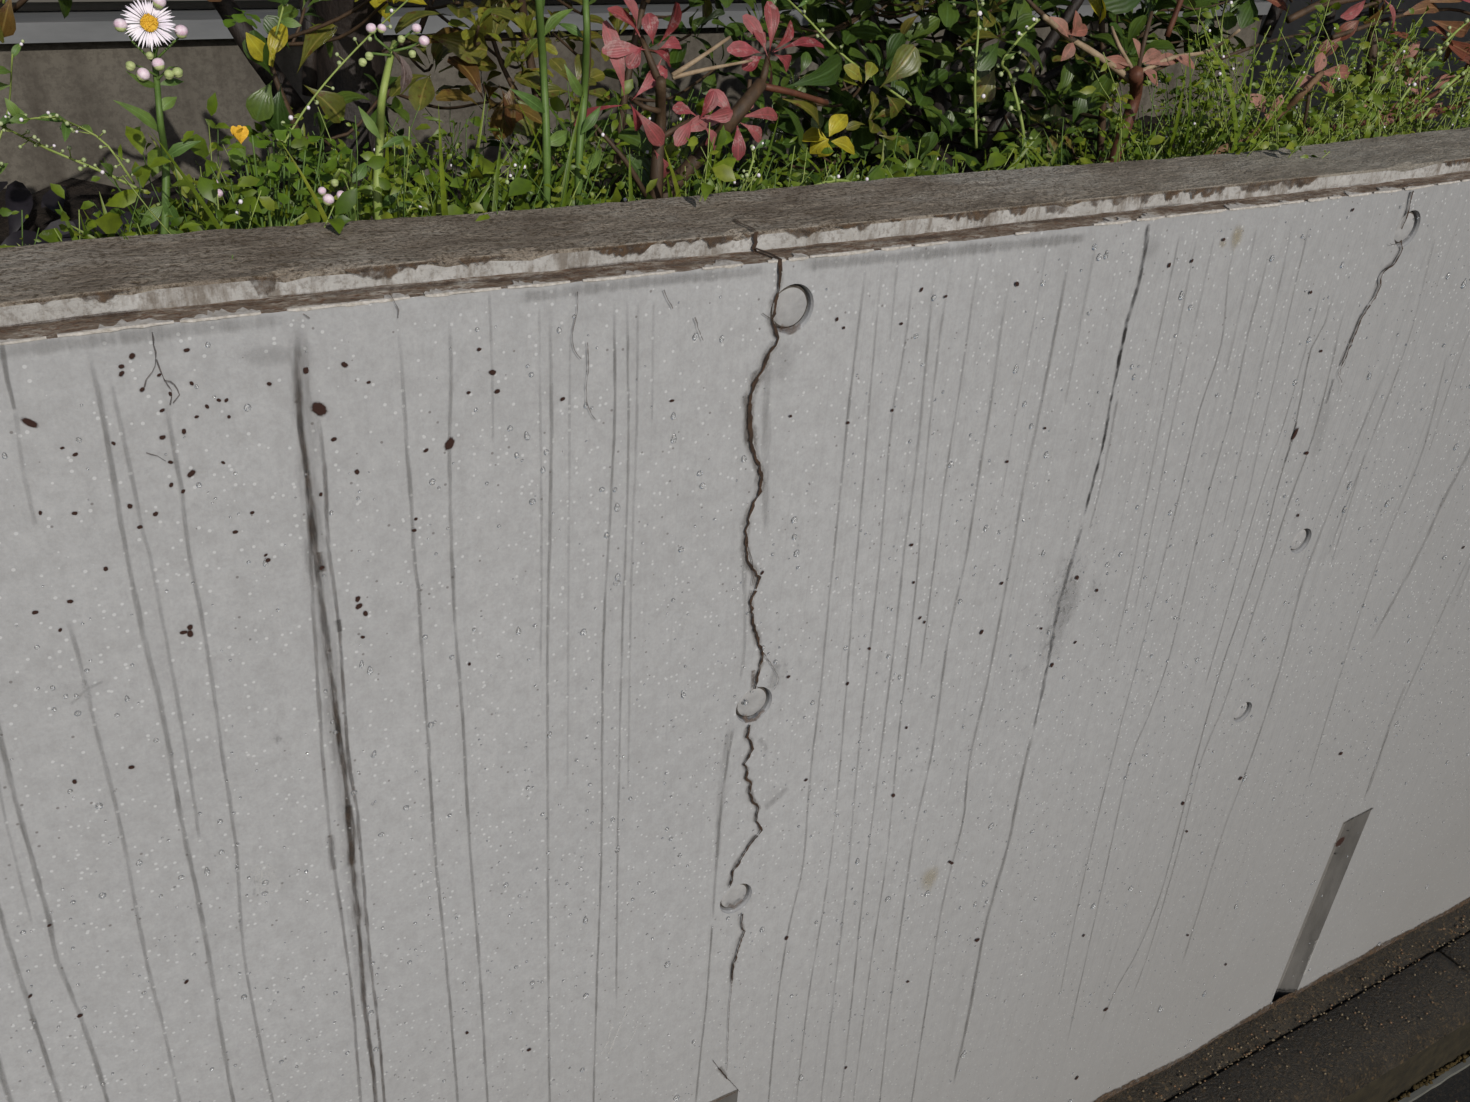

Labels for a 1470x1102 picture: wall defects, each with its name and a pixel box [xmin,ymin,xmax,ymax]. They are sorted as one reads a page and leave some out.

leakage [297,382,323,574]
crack [733,218,783,689]
leakage [331,678,355,885]
leakage [358,905,382,1100]
crack [713,725,763,1092]